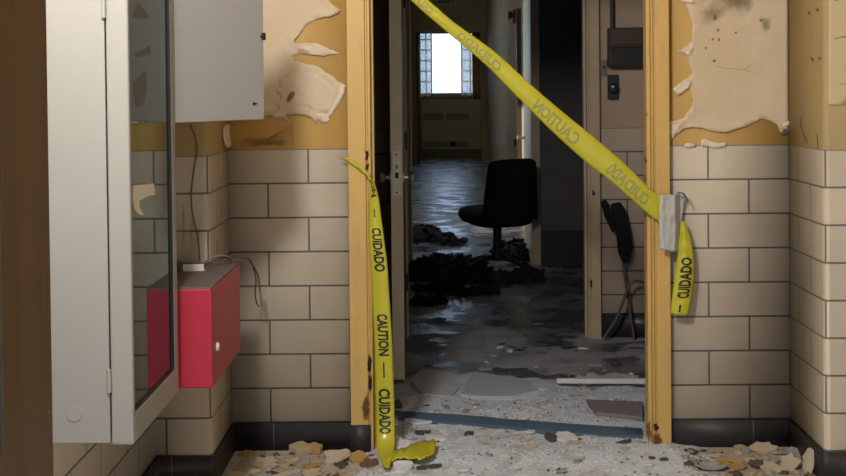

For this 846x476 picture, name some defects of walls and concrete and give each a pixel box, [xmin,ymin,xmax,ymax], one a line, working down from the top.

peeling [263,0,346,124]
peeling [669,0,789,148]